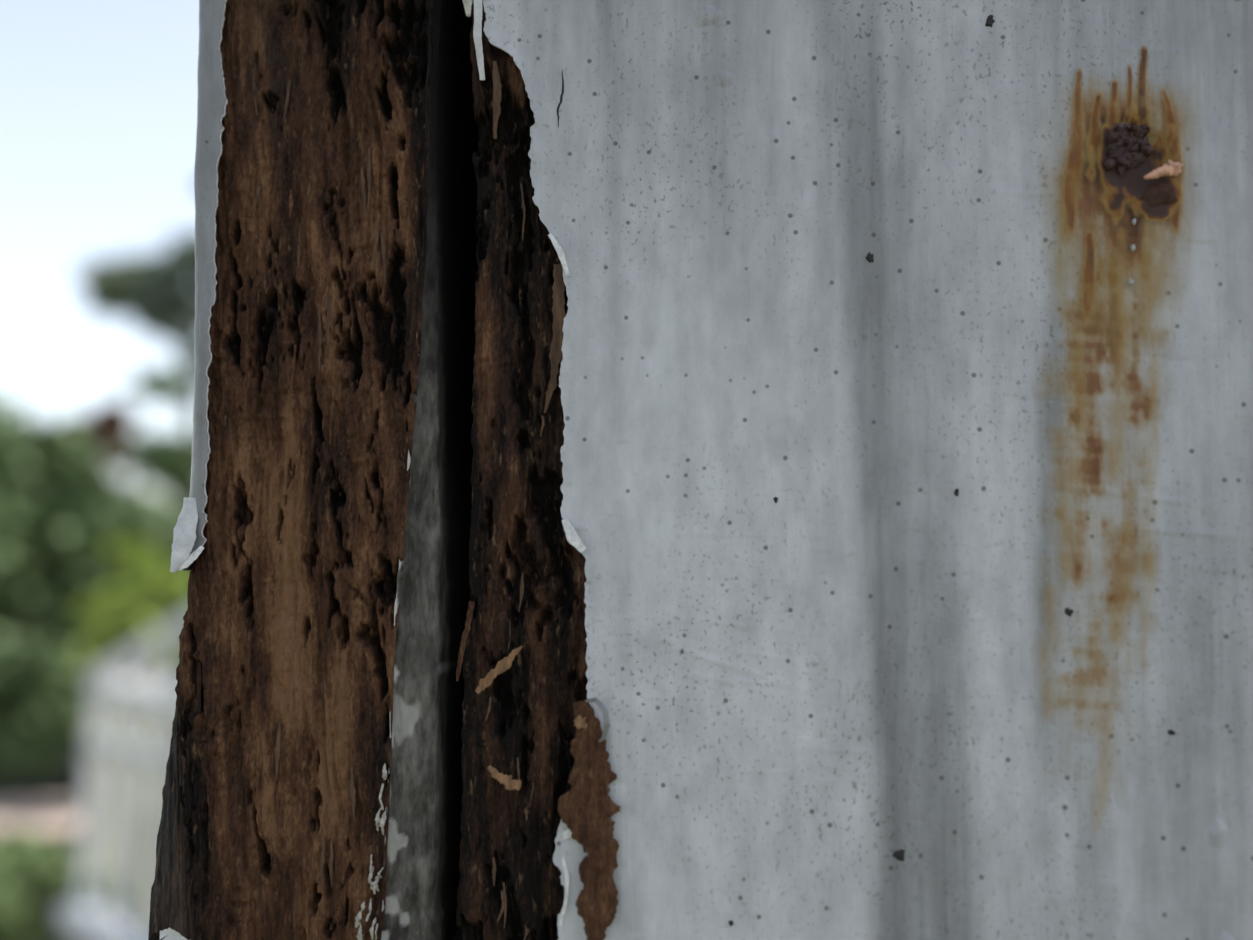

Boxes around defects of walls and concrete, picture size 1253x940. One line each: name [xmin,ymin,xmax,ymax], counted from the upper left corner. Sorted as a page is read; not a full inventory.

peeling [463,0,485,81]
peeling [548,233,570,277]
rust [1059,46,1183,495]
peeling [170,497,204,573]
peeling [562,518,586,553]
rust [1057,511,1086,583]
rust [1102,521,1148,610]
peeling [557,697,621,940]